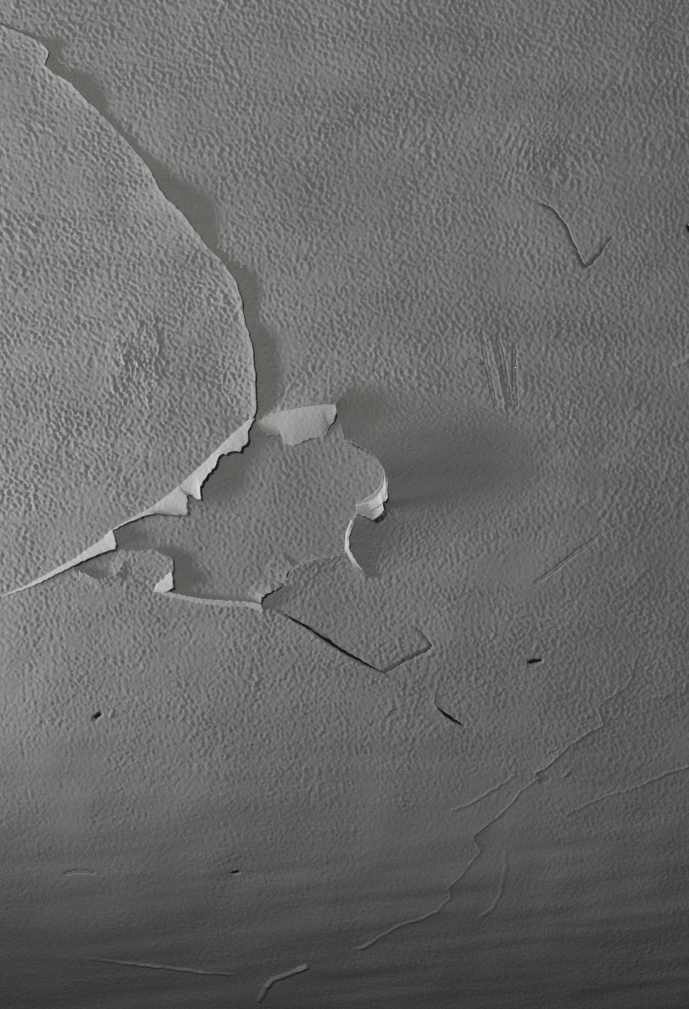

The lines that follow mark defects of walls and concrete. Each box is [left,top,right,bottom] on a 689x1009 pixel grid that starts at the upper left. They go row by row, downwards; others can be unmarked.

peeling [2,377,547,615]
crack [258,606,465,734]
crack [354,647,642,951]
crack [255,964,309,1003]